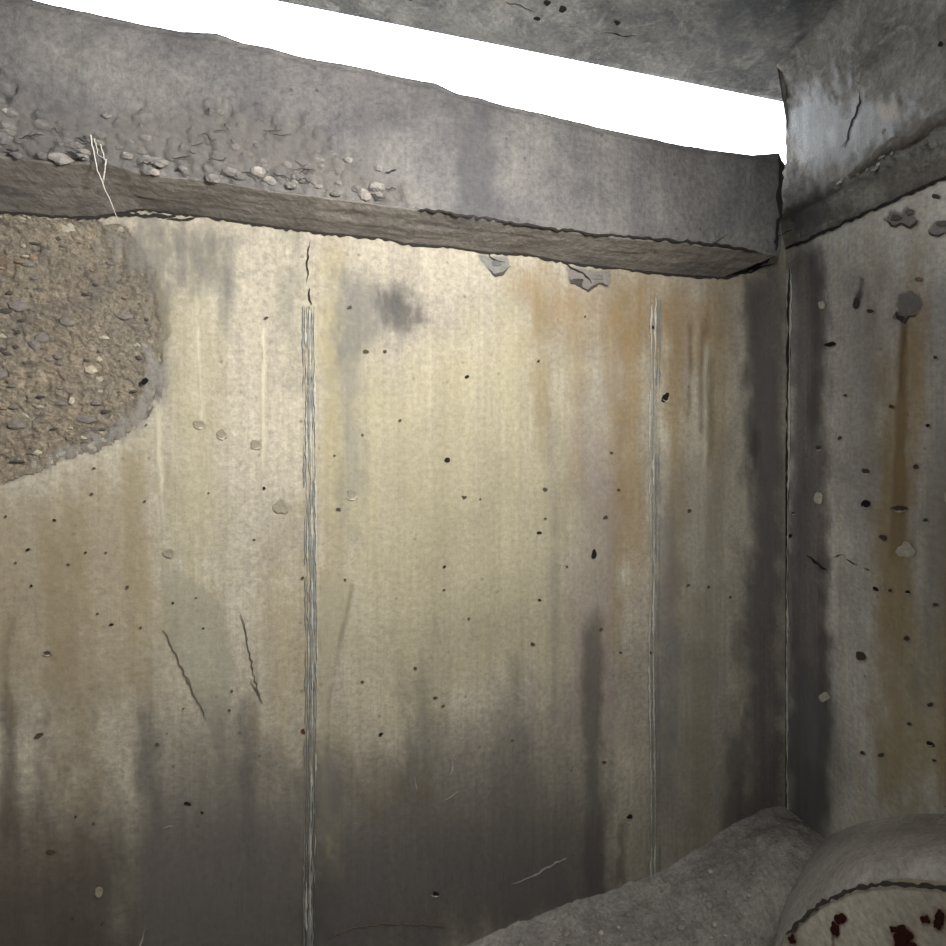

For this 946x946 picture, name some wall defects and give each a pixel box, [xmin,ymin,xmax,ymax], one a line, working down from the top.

crack [843,81,861,147]
crack [0,156,946,304]
spalling [883,207,917,229]
spalling [479,255,511,277]
spalling [568,269,610,292]
spalling [0,214,169,485]
crack [241,615,263,703]
damp [142,789,300,946]
damp [320,805,605,946]
corrosion [830,913,847,944]
corrosion [889,925,917,946]
corrosion [920,909,945,930]